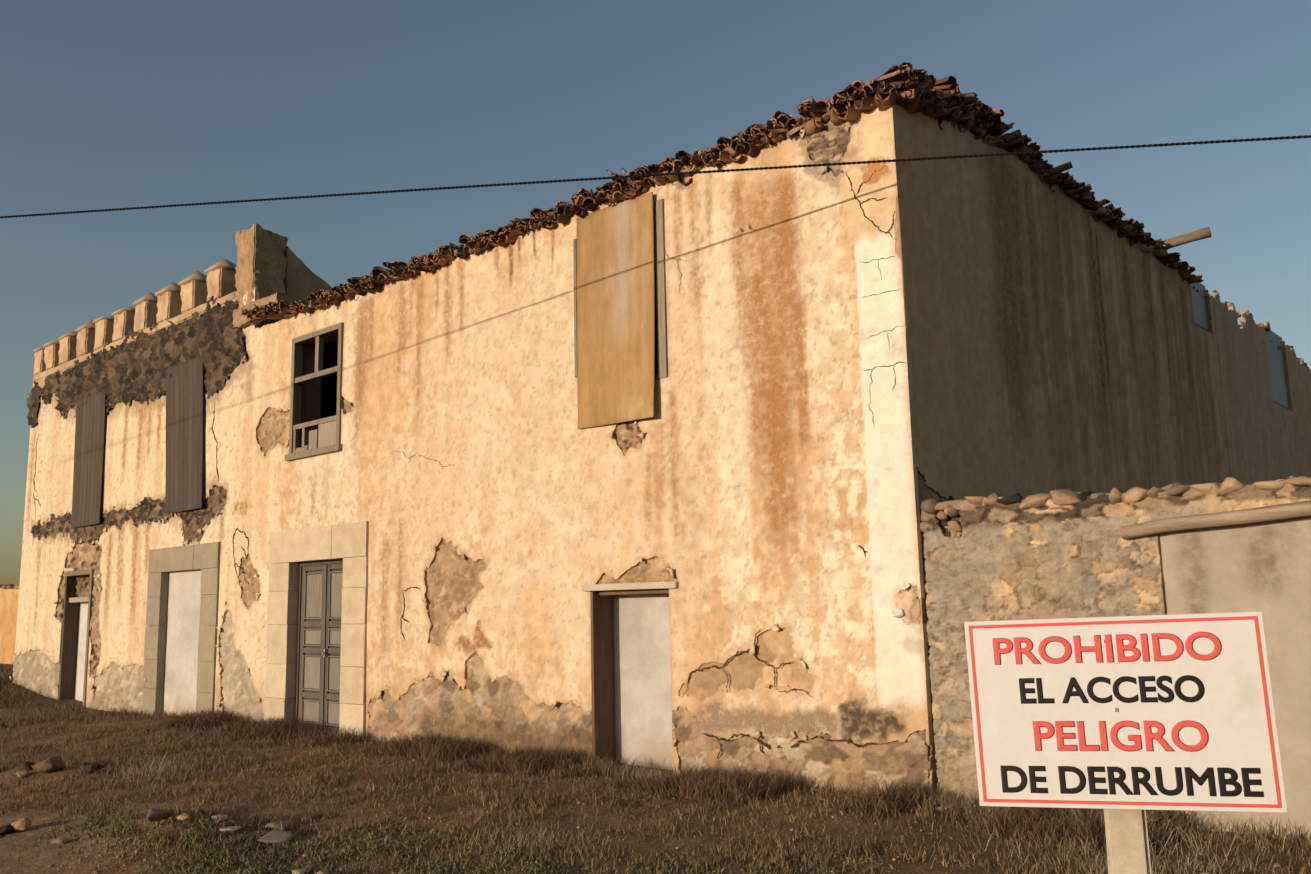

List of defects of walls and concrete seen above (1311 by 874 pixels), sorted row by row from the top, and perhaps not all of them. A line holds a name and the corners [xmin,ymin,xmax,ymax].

crack [846,165,897,298]
flaking render [27,296,248,428]
flaking render [257,408,290,455]
crack [864,324,905,427]
flaking render [29,485,228,714]
flaking render [238,555,260,609]
flaking render [421,539,487,646]
flaking render [598,556,678,584]
flaking render [9,647,60,700]
flaking render [216,603,264,725]
flaking render [367,651,592,763]
flaking render [672,624,934,799]